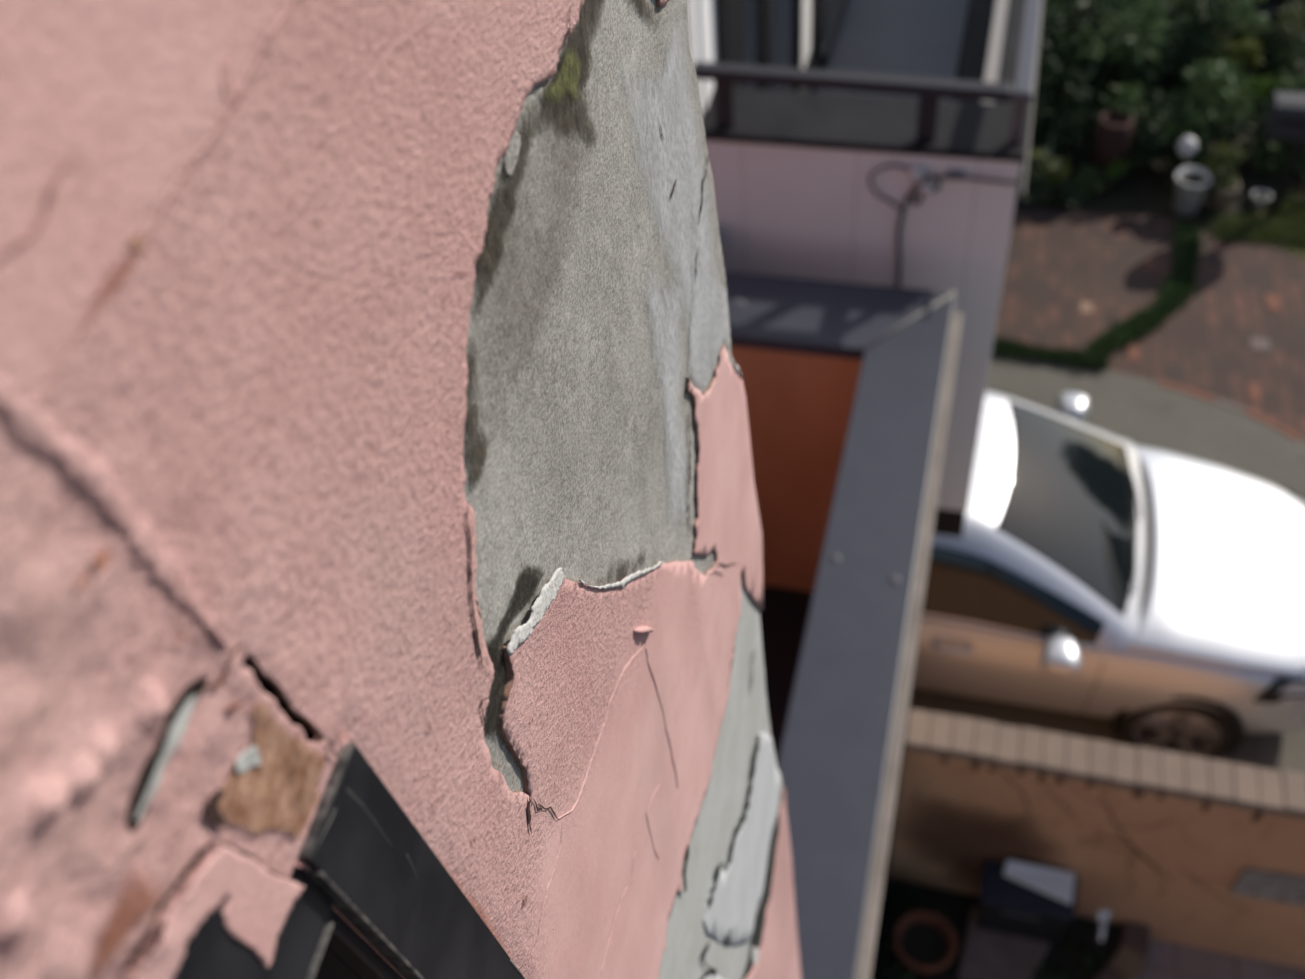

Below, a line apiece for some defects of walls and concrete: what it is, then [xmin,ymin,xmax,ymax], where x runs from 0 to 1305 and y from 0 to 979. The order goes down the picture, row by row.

peeling [463,0,743,669]
spalling [205,656,325,837]
peeling [483,691,526,794]
peeling [659,575,782,979]